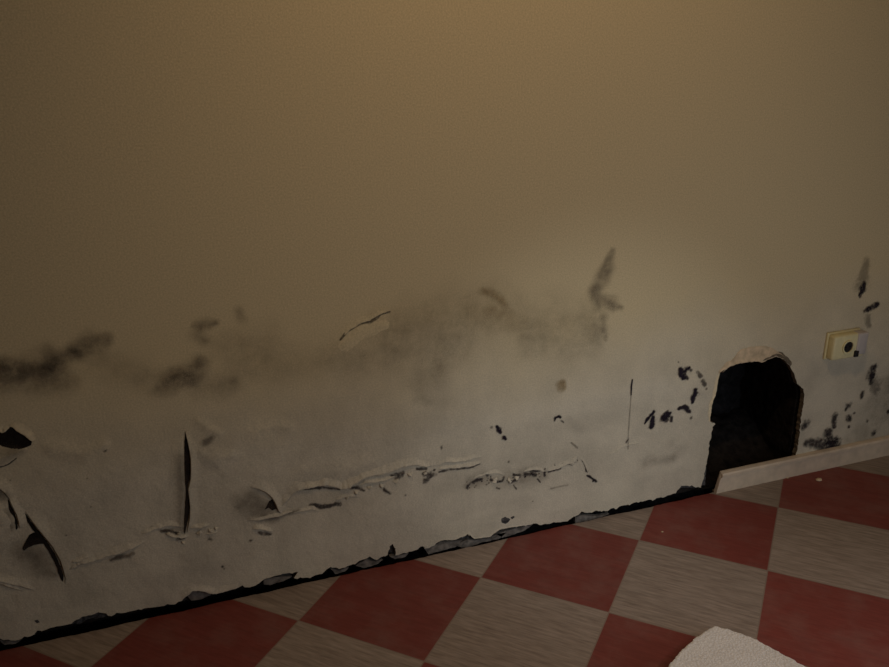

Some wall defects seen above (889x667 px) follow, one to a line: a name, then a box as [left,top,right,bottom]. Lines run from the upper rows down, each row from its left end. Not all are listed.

leakage [804,404,855,450]
leakage [860,364,877,399]
crack [168,430,202,533]
spalling [0,346,792,650]